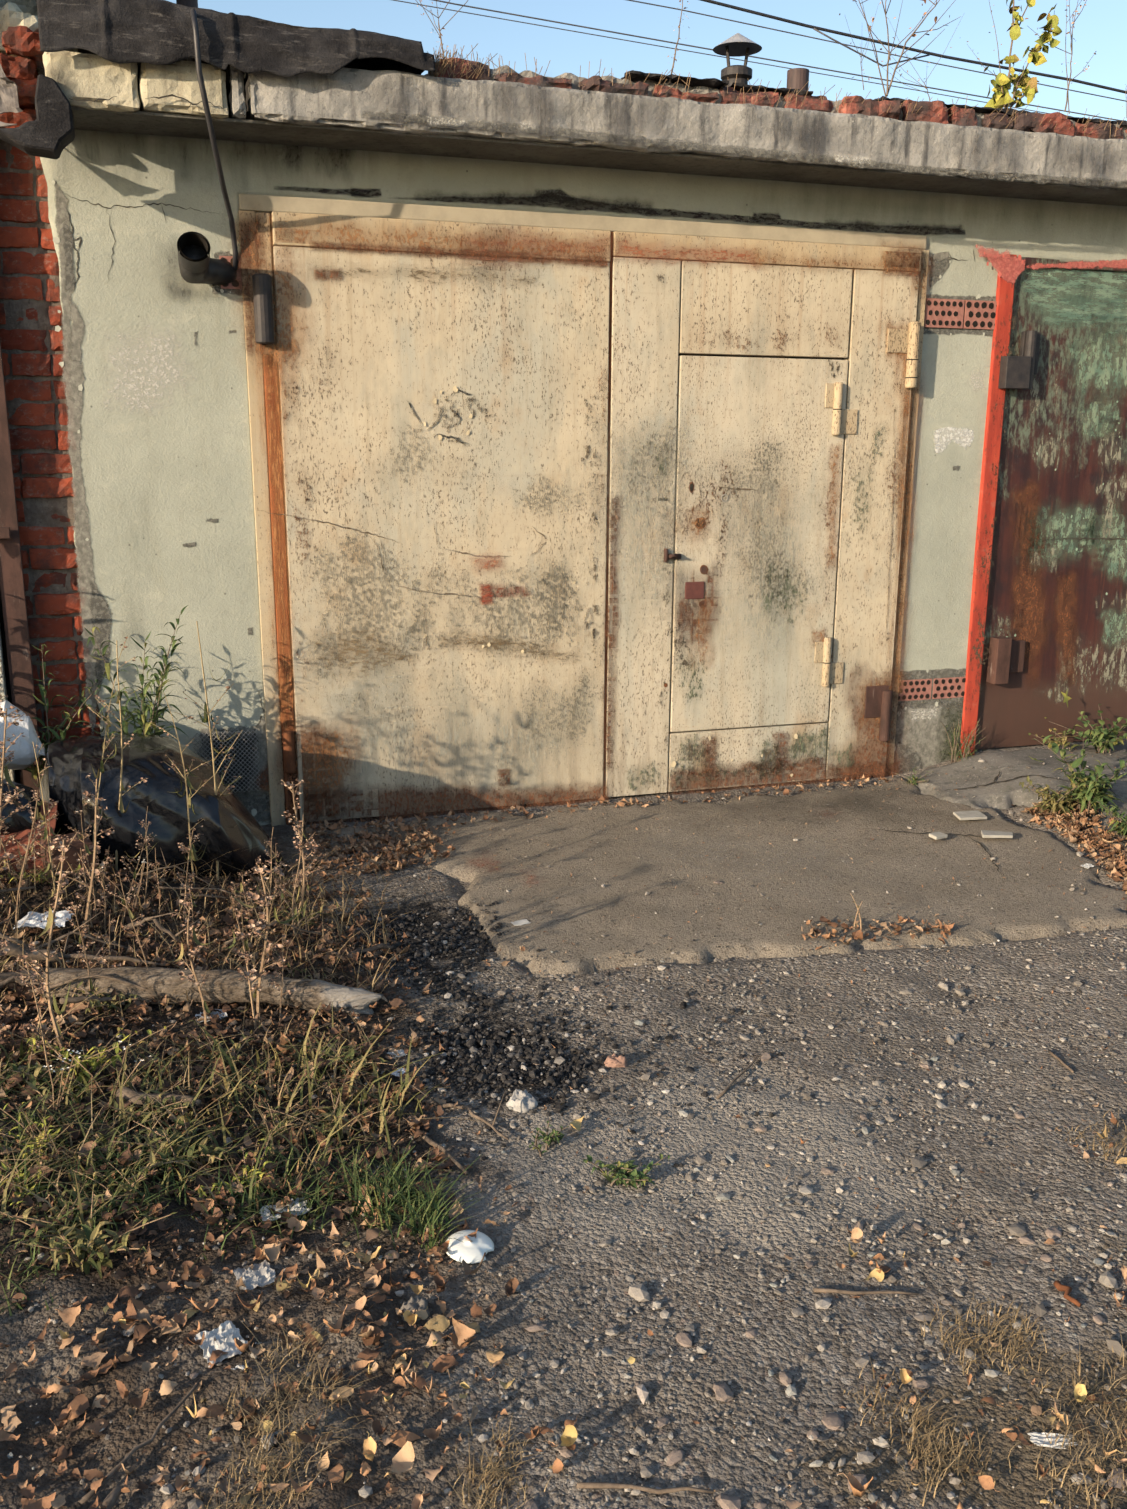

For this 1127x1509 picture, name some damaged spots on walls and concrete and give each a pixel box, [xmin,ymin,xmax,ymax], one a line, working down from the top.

spalling [52,180,111,733]
crack [67,194,218,282]
corrosion [238,219,929,825]
peeling [923,245,1127,702]